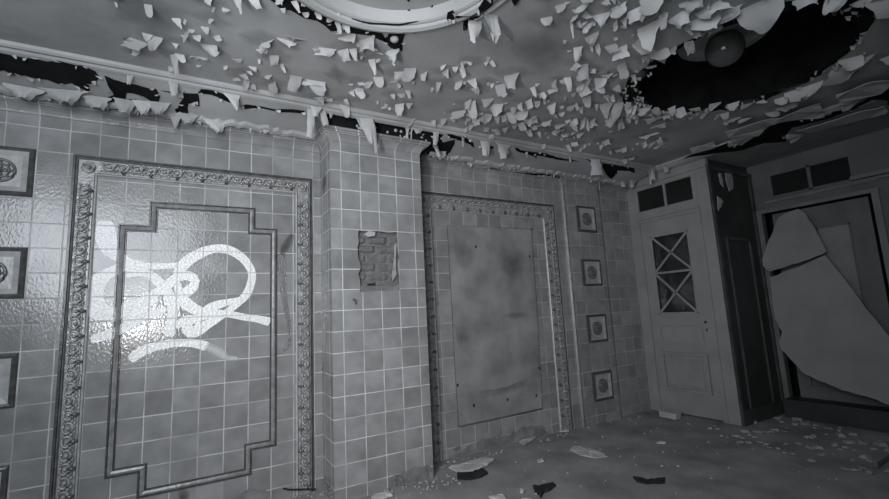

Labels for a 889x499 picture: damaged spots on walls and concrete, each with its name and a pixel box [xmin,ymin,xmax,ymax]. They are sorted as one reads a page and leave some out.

peeling [121,0,262,76]
peeling [223,0,889,165]